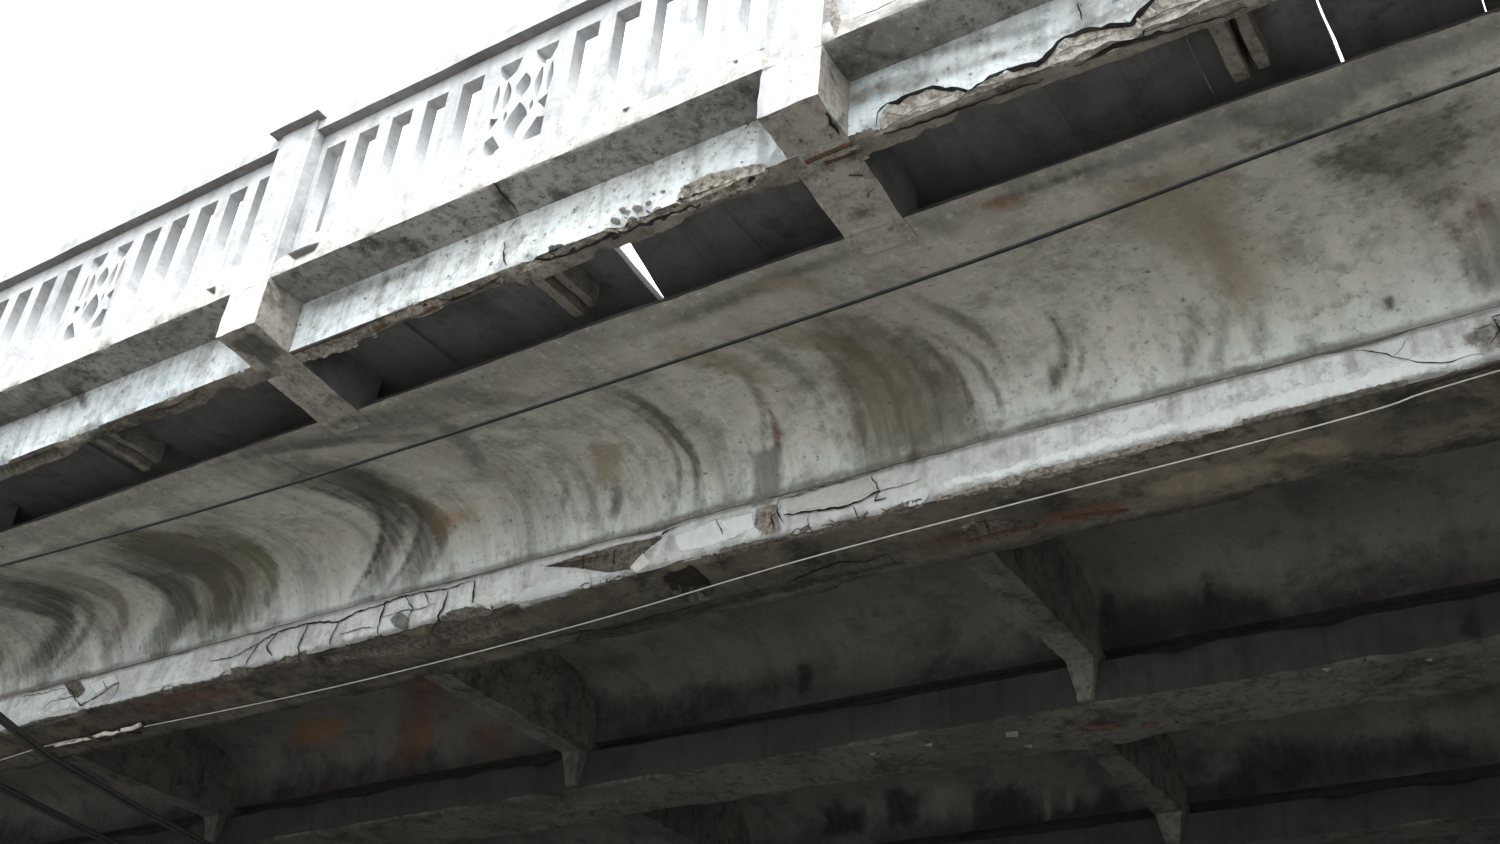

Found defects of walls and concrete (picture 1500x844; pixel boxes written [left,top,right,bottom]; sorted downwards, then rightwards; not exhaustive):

spalling [876,0,1247,134]
peeling [288,242,319,259]
spalling [522,161,769,267]
spalling [294,276,504,362]
crack [1356,314,1500,363]
damp [67,386,85,404]
damp [17,588,74,659]
damp [122,531,276,652]
crack [210,580,475,664]
damp [314,471,447,575]
crack [548,474,922,643]
peeling [0,319,1500,736]